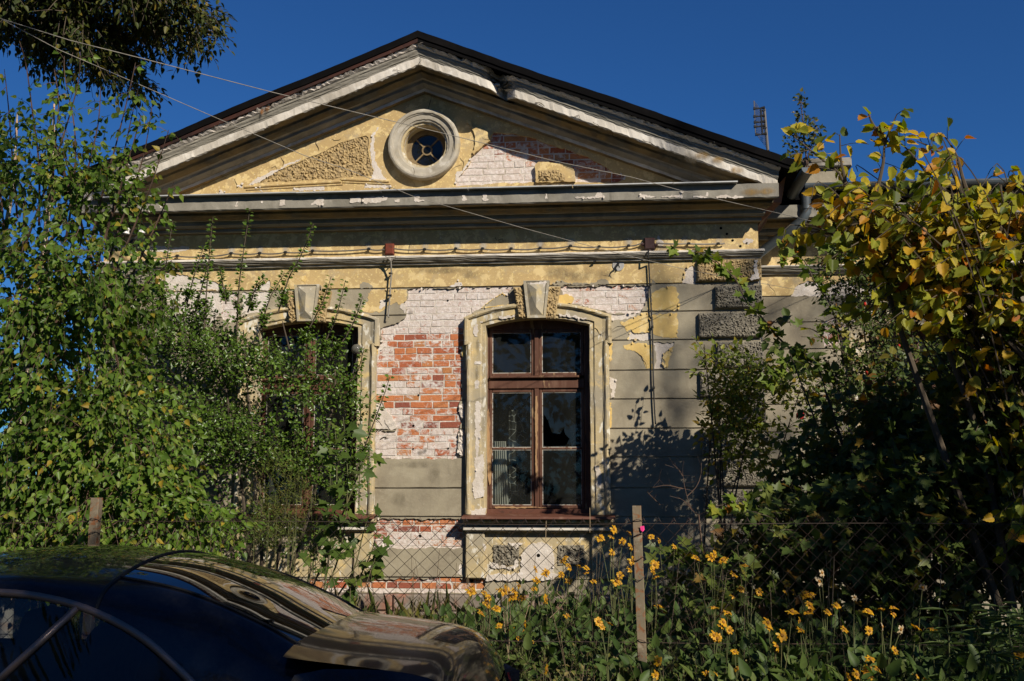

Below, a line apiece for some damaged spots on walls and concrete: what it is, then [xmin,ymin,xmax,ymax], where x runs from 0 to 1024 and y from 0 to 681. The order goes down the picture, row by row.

flaking render [455,133,626,201]
peeling [637,191,744,199]
flaking render [530,265,697,369]
flaking render [360,279,547,549]
flaking render [310,542,558,594]